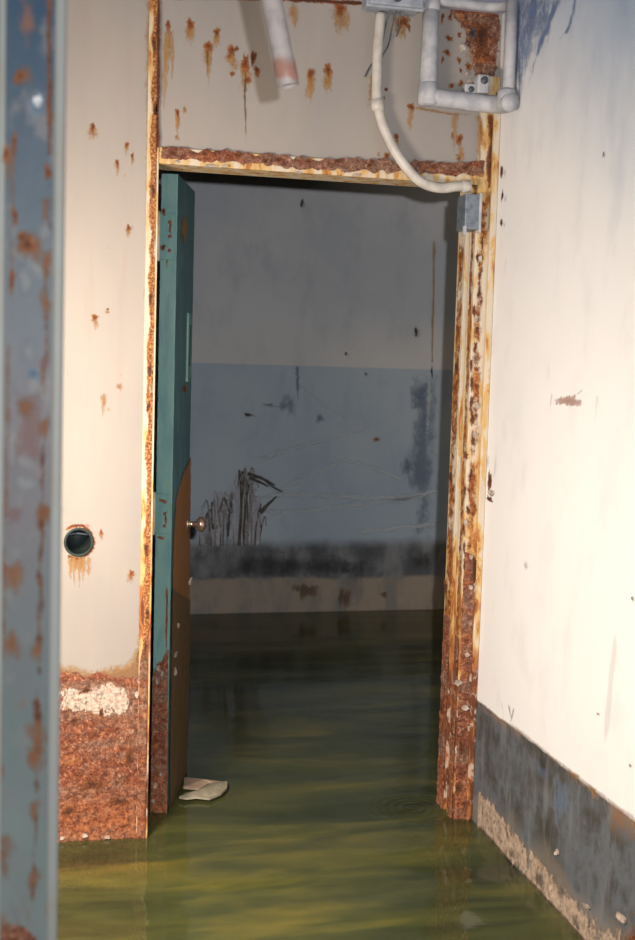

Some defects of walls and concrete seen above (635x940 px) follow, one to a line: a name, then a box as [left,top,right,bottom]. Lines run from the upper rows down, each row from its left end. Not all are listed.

corrosion [45,0,53,180]
corrosion [2,132,51,314]
corrosion [58,0,500,891]
corrosion [3,553,23,589]
corrosion [32,505,51,656]
corrosion [28,697,43,767]
corrosion [0,924,36,940]